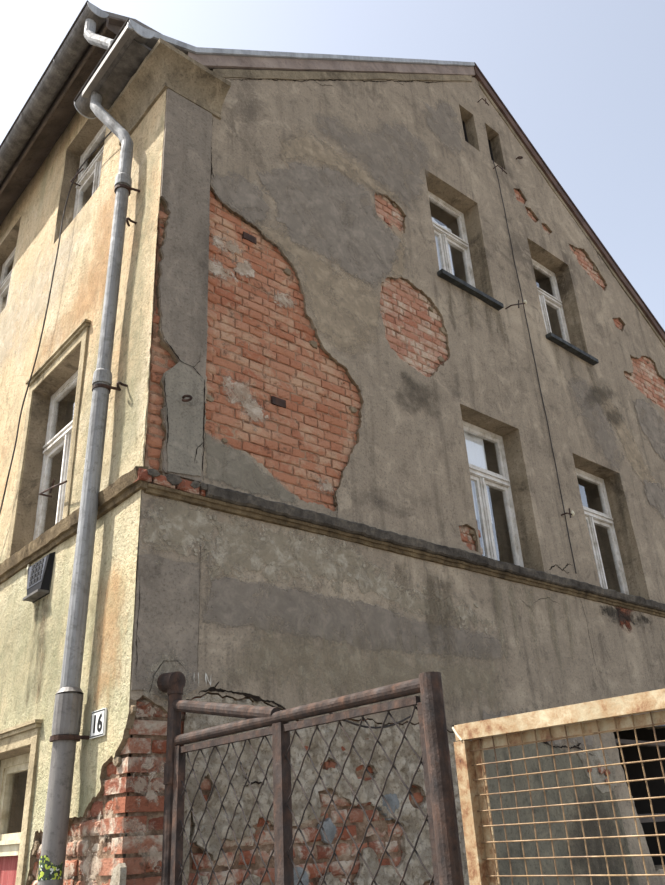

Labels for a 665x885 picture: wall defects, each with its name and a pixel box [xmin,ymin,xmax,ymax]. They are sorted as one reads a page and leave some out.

spalling [513,188,552,235]
spalling [569,244,607,291]
peeling [133,185,495,634]
spalling [624,354,665,411]
crack [136,578,164,693]
spalling [186,692,284,710]
crack [197,678,286,710]
crack [544,742,592,755]
spalling [63,695,168,885]
spalling [26,829,43,885]
spalling [188,818,275,885]
spalling [292,789,403,885]